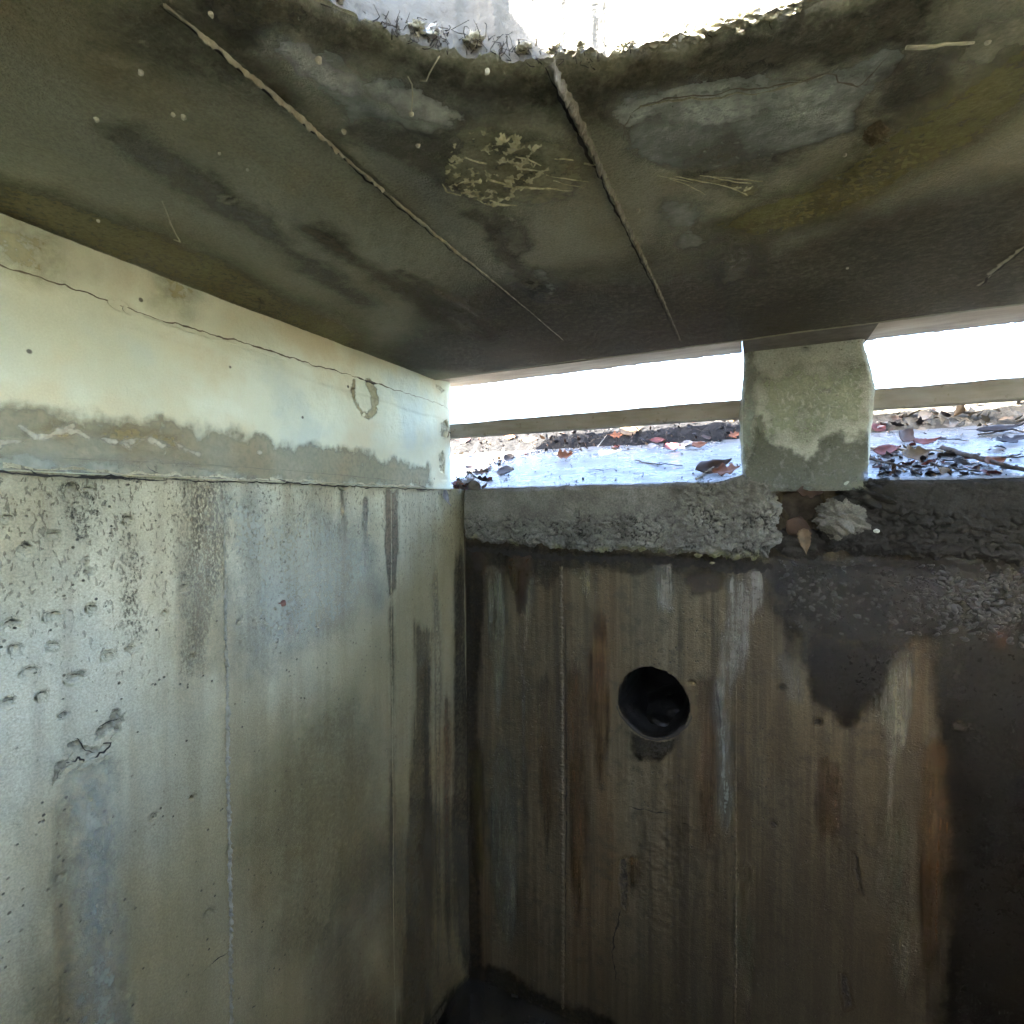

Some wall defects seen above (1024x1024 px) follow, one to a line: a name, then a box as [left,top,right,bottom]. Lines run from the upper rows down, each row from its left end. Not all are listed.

crack [623,57,888,139]
water stain [109,128,369,305]
crack [0,264,451,436]
peeling [351,378,381,419]
water stain [743,352,868,491]
water stain [0,407,431,664]
spalling [43,703,131,795]
water stain [383,574,614,1024]
water stain [468,543,1024,1024]